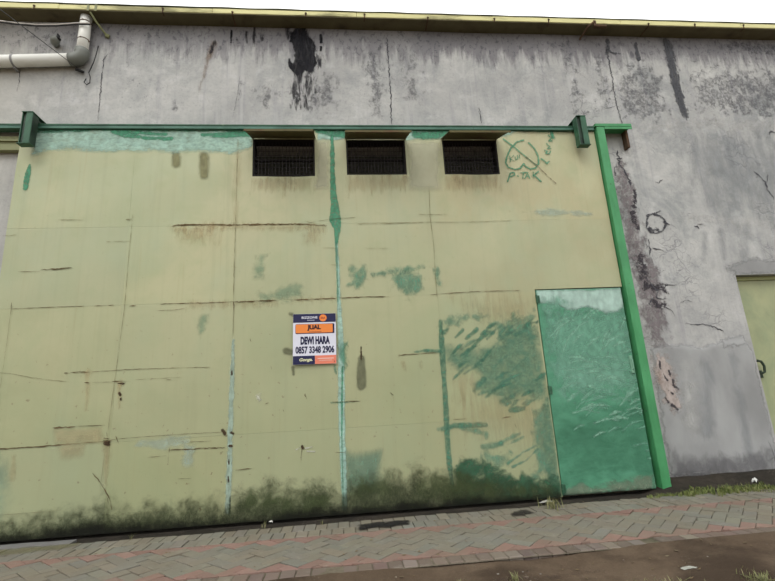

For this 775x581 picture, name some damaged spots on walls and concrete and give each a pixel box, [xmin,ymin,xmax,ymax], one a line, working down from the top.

leakage [285,28,323,110]
crack [385,37,393,124]
crack [605,54,622,122]
leakage [624,38,689,120]
leakage [646,212,669,234]
spalling [616,160,681,410]
crack [645,239,689,314]
rust [84,281,149,509]